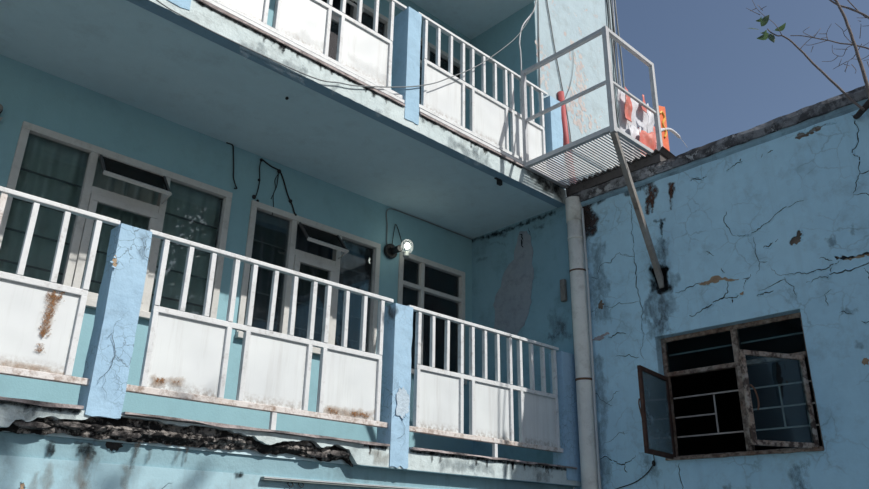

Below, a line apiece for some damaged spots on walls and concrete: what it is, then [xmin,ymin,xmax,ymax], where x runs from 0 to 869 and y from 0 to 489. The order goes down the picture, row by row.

peeling [564,32,601,134]
leakage [421,116,561,199]
crack [850,113,869,195]
corrosion [645,184,658,214]
leakage [649,265,672,295]
crack [689,200,869,325]
flaking render [790,229,804,246]
corrosion [35,290,65,352]
crack [98,315,124,392]
peeling [396,387,410,420]
spalling [0,417,353,467]
leakage [411,450,566,471]